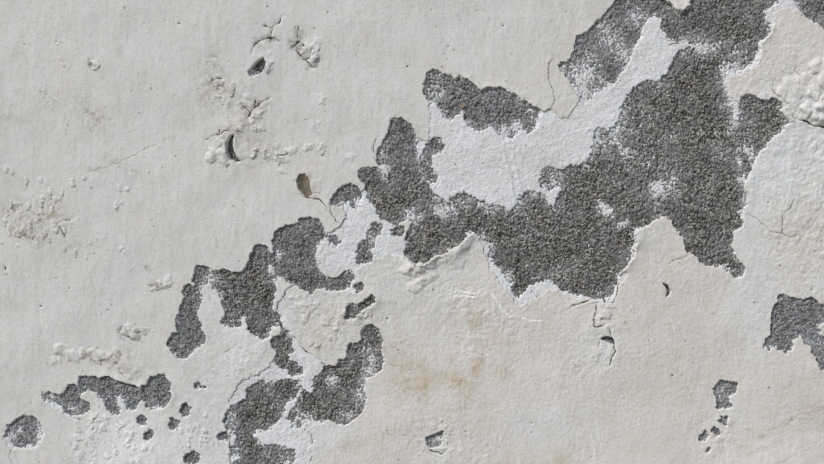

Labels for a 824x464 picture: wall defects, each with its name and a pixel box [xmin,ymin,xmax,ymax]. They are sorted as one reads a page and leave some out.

peeling [167,0,824,464]
peeling [3,414,45,449]
peeling [42,374,172,441]